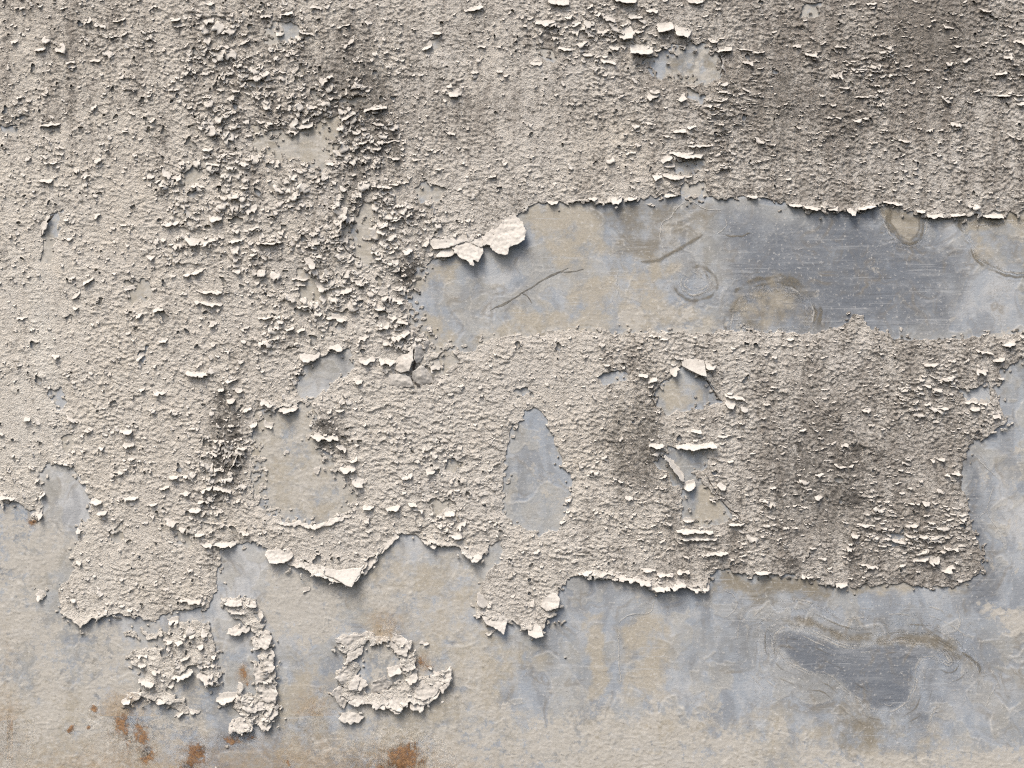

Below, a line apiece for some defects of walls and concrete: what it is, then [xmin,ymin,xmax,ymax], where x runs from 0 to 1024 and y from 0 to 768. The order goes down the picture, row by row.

peeling [558,0,765,102]
peeling [990,39,1024,76]
peeling [831,67,884,98]
peeling [652,143,714,181]
peeling [0,189,1024,768]
rust [116,716,153,763]
rust [180,744,205,768]
rust [378,745,422,768]